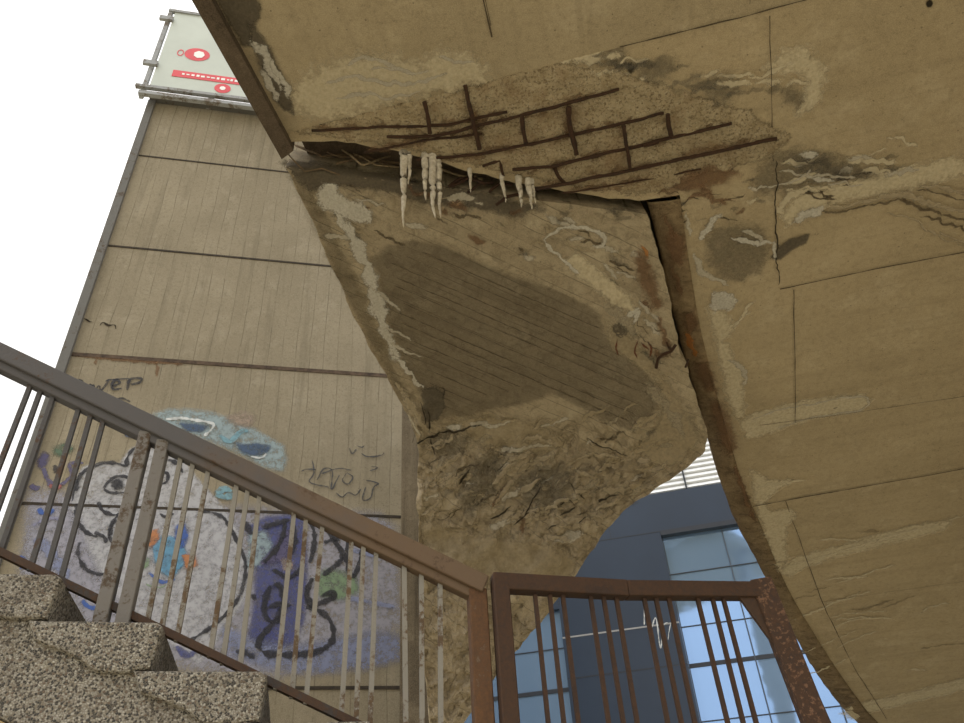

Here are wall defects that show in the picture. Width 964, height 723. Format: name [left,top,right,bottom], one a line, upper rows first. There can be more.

damp [217,0,491,120]
spalling [296,63,790,206]
damp [700,46,828,115]
damp [283,160,536,388]
damp [519,216,668,358]
crack [772,161,780,284]
damp [693,254,872,438]
damp [660,136,964,260]
spalling [395,382,445,436]
crack [412,424,480,454]
flaking render [422,417,627,579]